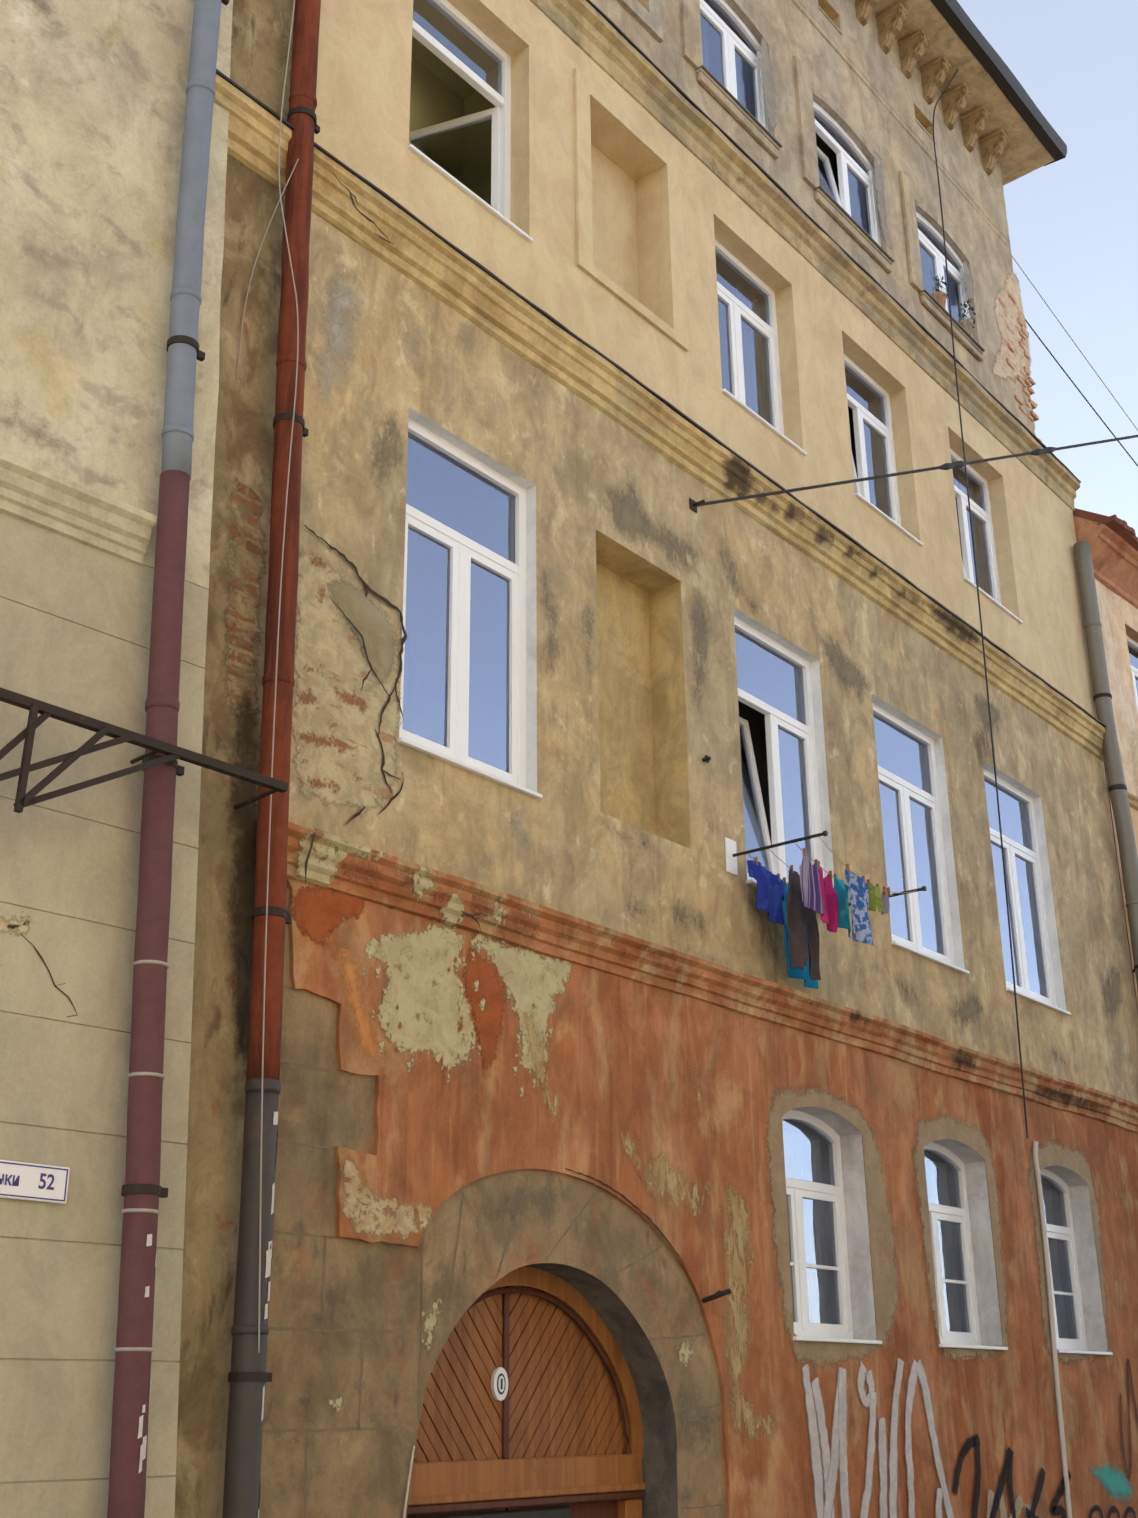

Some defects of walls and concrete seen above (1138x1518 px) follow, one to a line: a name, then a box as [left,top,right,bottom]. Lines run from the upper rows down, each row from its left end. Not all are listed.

flaking render [992,271,1042,442]
flaking render [223,479,266,716]
flaking render [292,549,402,815]
crack [304,525,407,883]
spalling [293,826,387,889]
crack [21,934,78,1017]
peeling [362,865,574,1116]
peeling [343,1160,432,1241]
spalling [329,1397,348,1412]
spalling [421,1299,444,1350]
peeling [623,1134,774,1443]